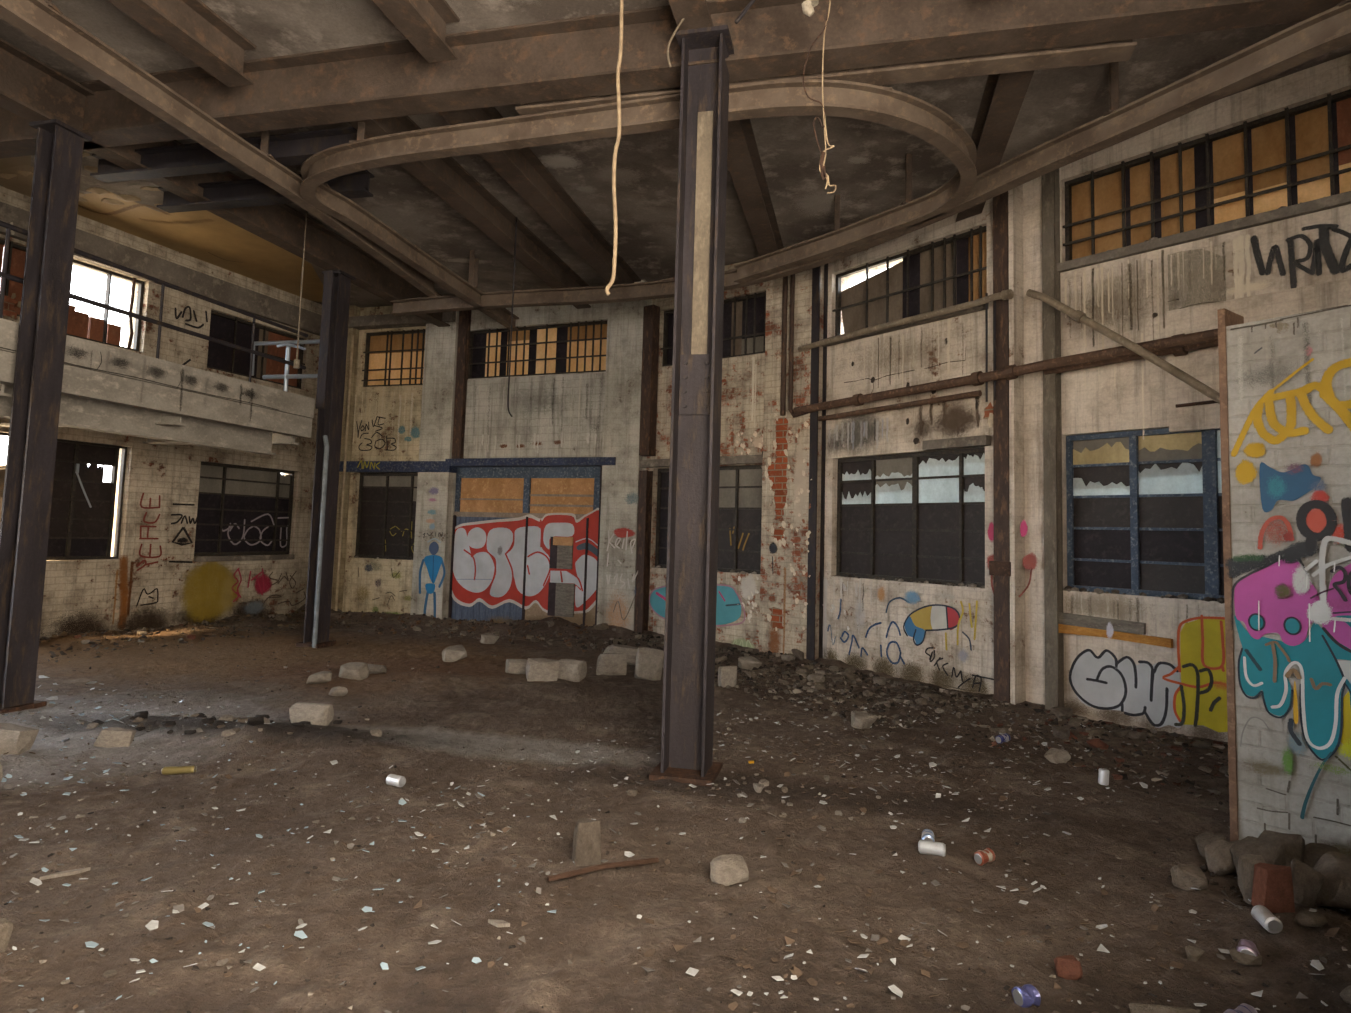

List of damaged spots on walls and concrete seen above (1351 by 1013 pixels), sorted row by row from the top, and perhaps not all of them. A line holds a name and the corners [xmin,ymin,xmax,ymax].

leakage [1064,234,1270,353]
flaking render [734,412,872,659]